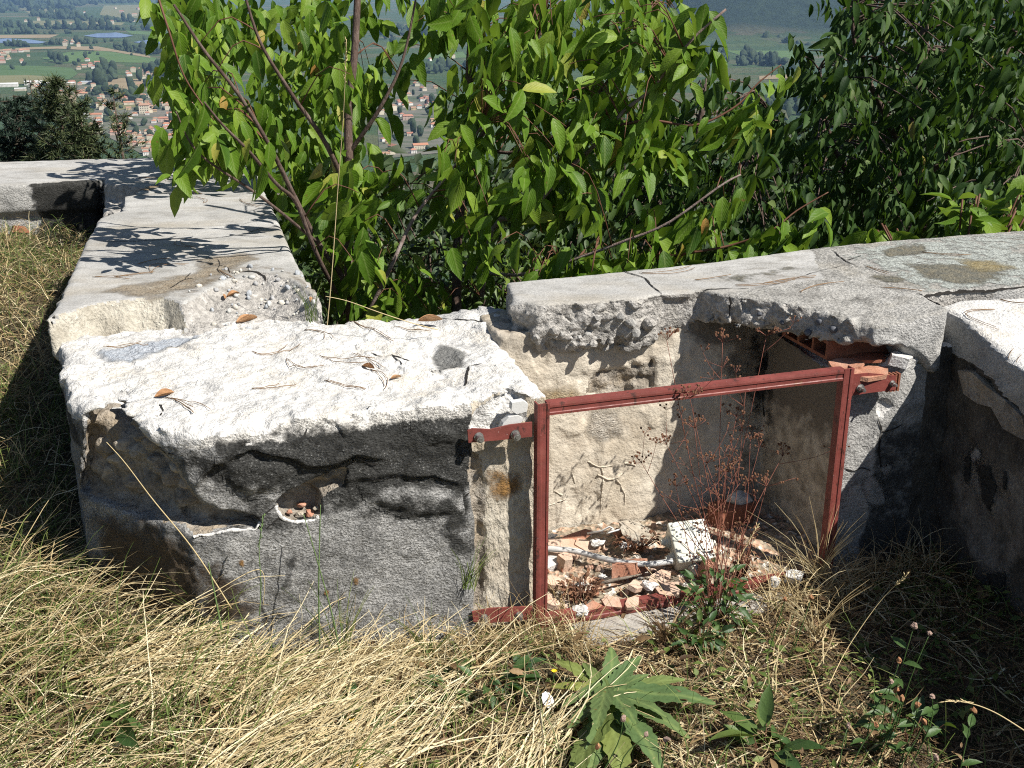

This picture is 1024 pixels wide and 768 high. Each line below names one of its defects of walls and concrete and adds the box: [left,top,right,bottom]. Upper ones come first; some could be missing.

crack [917,286,1024,305]
spalling [46,272,870,539]
crack [288,429,470,521]
corrosion [489,471,520,498]